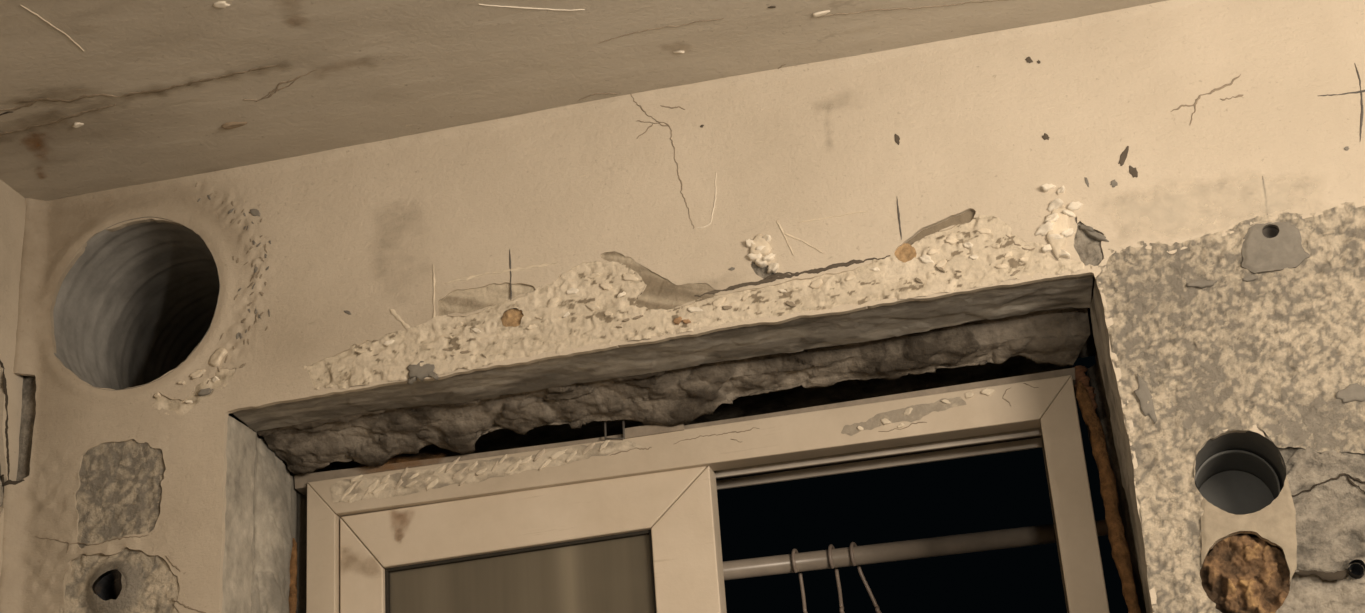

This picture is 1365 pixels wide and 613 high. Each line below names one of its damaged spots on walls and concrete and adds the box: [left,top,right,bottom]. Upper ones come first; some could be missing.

crack [1171,74,1243,125]
crack [579,93,694,229]
spalling [1110,146,1138,188]
spalling [251,183,1365,613]
crack [1292,473,1365,497]
flaking render [60,440,185,613]
crack [1295,569,1351,581]